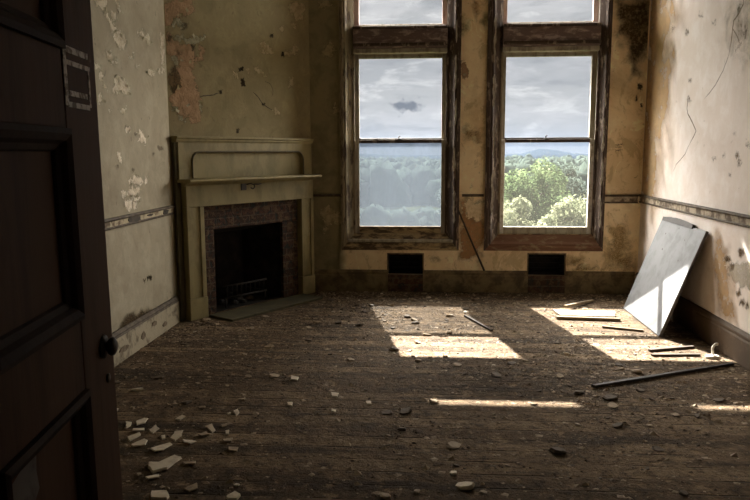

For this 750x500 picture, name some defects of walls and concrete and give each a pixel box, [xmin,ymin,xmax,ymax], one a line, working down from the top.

flaking render [94,0,205,125]
damp [615,0,676,197]
crack [706,0,744,97]
peeling [121,169,153,222]
damp [120,310,150,328]